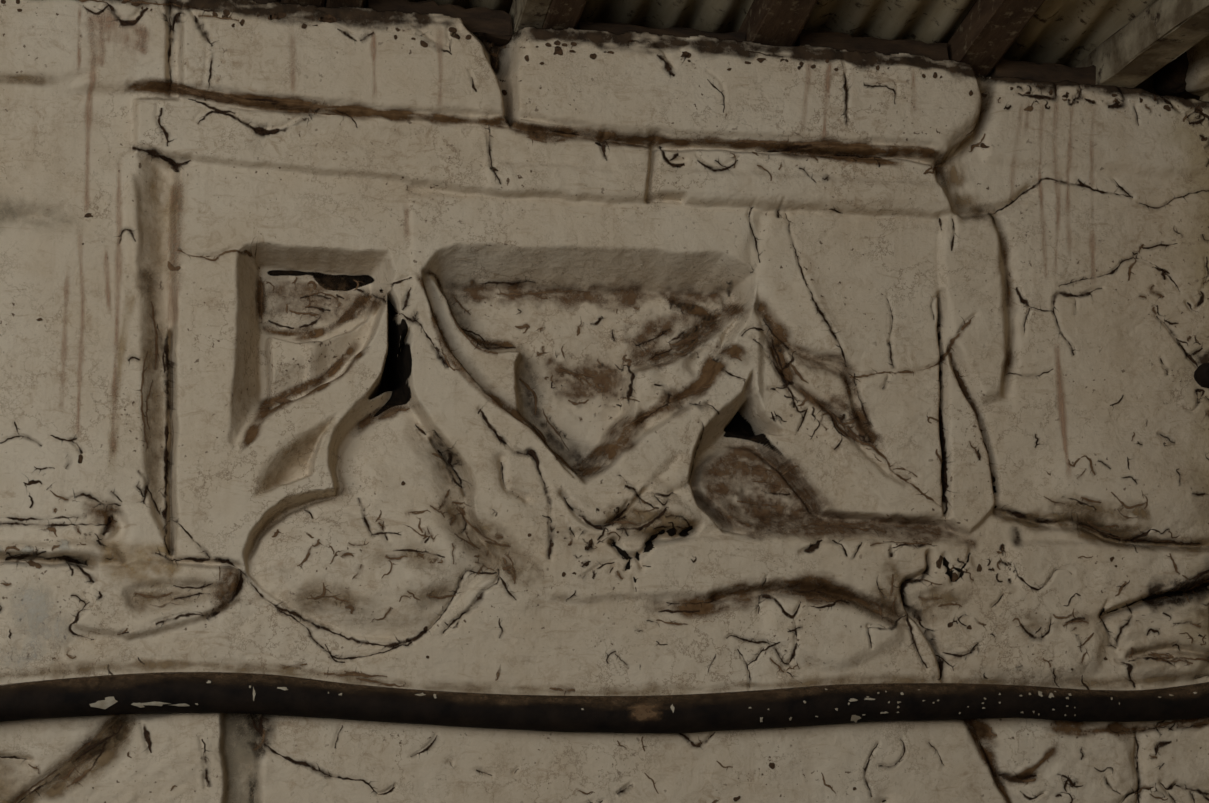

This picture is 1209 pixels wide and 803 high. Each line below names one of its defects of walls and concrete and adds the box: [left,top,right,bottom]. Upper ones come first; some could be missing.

crack [84,1,358,172]
crack [657,54,689,77]
crack [841,73,896,124]
crack [487,127,501,184]
crack [659,146,880,183]
crack [991,84,1209,416]
crack [0,304,719,675]
crack [127,726,152,758]
crack [263,725,395,795]
crack [578,736,659,803]
crack [679,732,733,768]
crack [864,740,944,802]